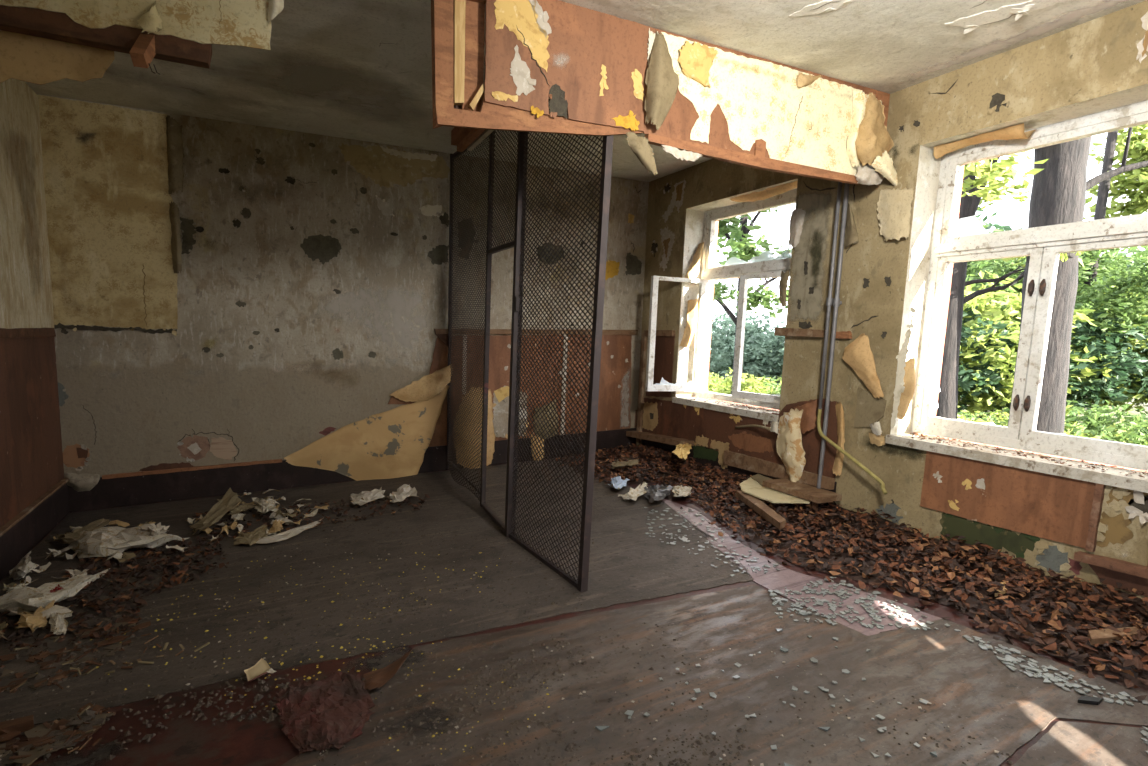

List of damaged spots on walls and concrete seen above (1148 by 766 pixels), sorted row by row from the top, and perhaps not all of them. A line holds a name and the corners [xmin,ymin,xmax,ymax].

spalling [523,79,568,119]
peeling [180,217,204,254]
peeling [290,219,359,265]
flaking render [331,348,343,360]
peeling [1097,485,1148,542]